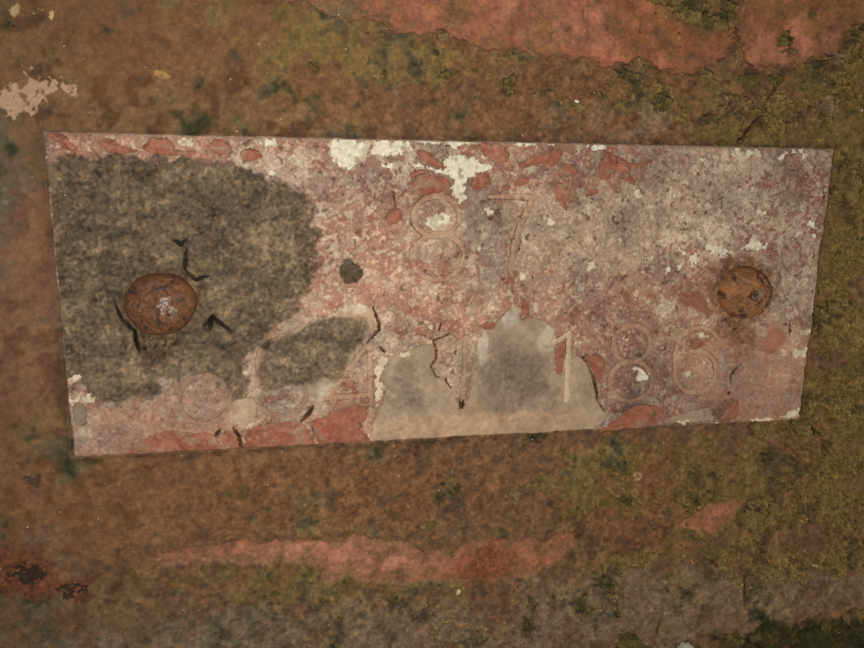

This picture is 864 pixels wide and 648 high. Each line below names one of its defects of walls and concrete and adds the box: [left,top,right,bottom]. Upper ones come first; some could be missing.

peeling [287,0,864,79]
peeling [329,139,577,210]
peeling [587,145,652,199]
rust [706,256,772,360]
peeling [129,301,739,454]
peeling [751,407,800,421]